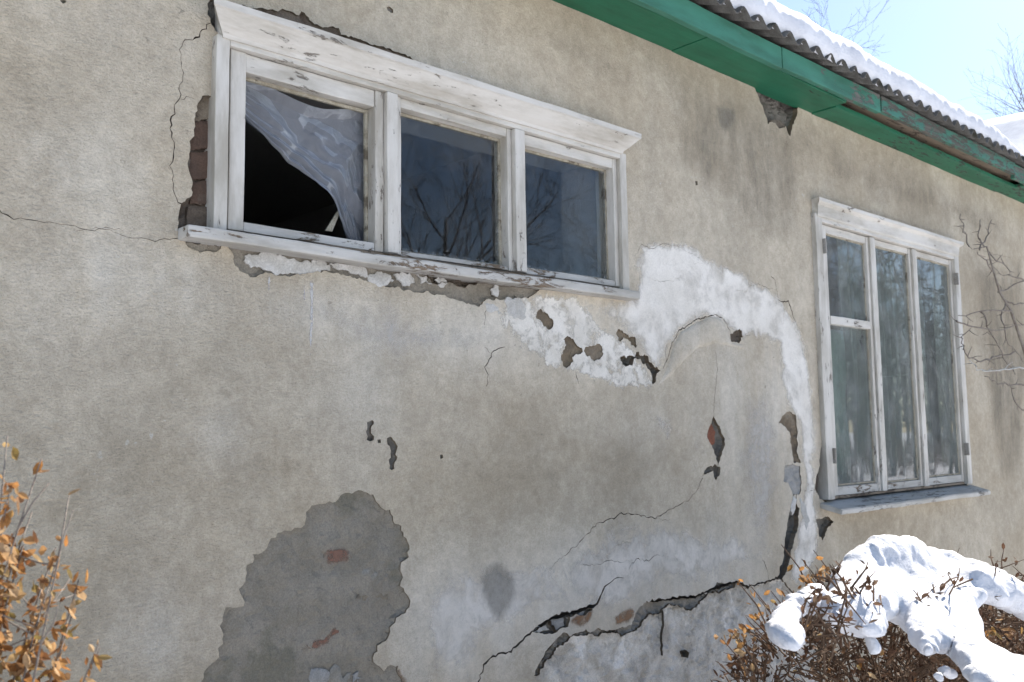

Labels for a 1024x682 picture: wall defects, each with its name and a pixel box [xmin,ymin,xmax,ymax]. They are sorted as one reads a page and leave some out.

crack [170,23,211,204]
spalling [178,95,211,229]
crack [0,210,177,242]
spalling [185,242,553,330]
spalling [561,336,603,368]
spalling [616,329,660,384]
crack [663,314,730,368]
spalling [201,490,410,682]
crack [478,478,703,682]
spalling [532,411,823,682]
crack [650,560,779,654]
crack [790,489,815,530]